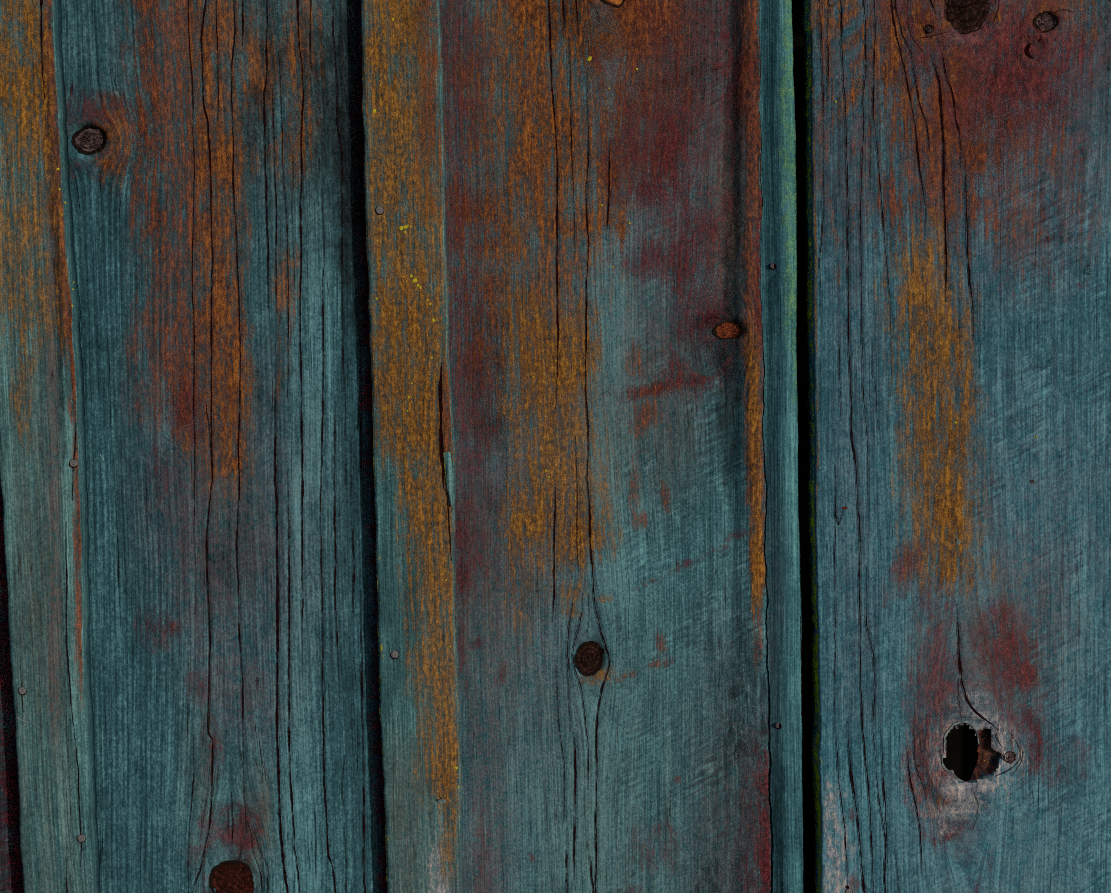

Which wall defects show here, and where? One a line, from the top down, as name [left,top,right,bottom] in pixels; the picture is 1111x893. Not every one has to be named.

crack [819,0,999,893]
crack [957,604,1023,829]